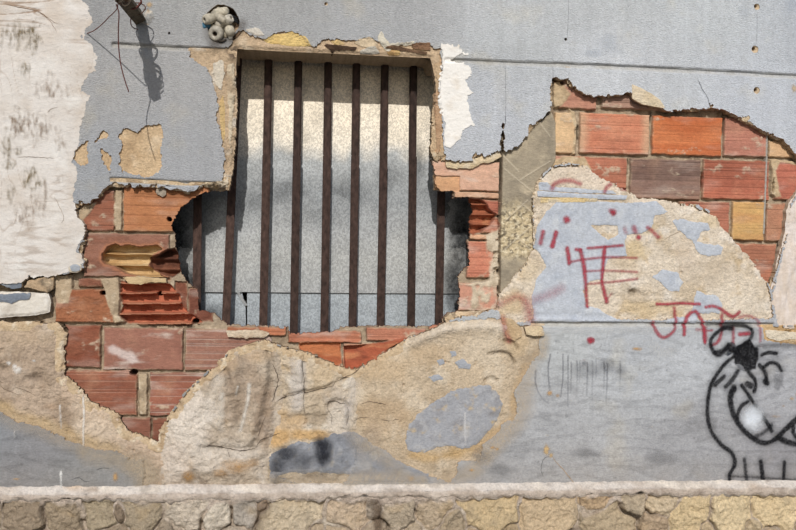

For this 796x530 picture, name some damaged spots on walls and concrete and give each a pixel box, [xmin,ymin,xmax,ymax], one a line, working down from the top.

spalling [0,27,440,485]
flaking render [226,57,796,482]